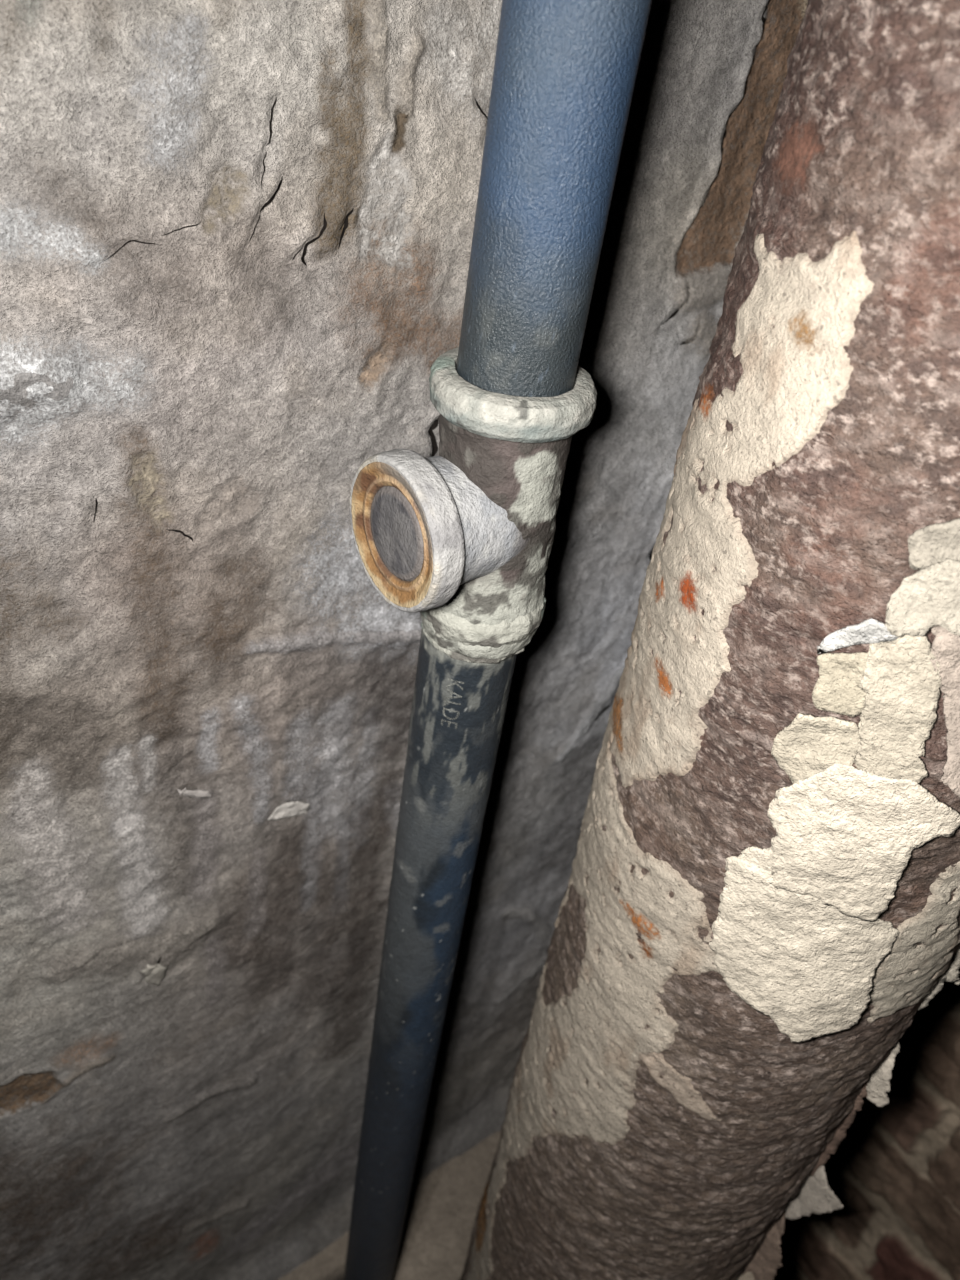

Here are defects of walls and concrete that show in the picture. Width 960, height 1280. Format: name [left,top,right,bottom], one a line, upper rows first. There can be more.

water stain [428,0,502,121]
crack [248,97,282,244]
water stain [316,0,373,253]
spalling [675,0,807,277]
crack [292,208,354,266]
crack [428,416,440,457]
corrosion [680,575,696,610]
corrosion [656,660,671,695]
peeling [709,518,960,1043]
corrosion [624,903,659,957]
spalling [0,1071,64,1115]
peeling [735,1040,901,1280]